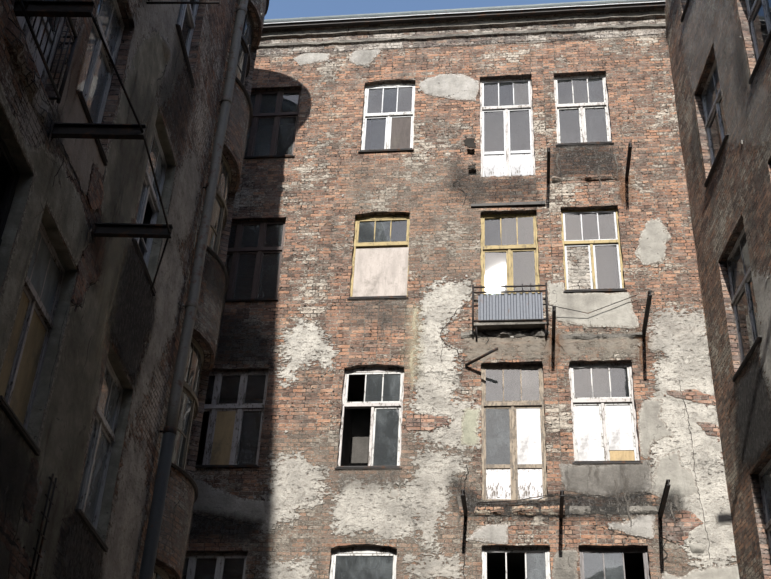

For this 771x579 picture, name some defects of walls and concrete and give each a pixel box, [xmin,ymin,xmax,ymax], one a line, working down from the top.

peeling [253,275,740,579]
crack [664,377,711,568]
peeling [750,266,771,402]